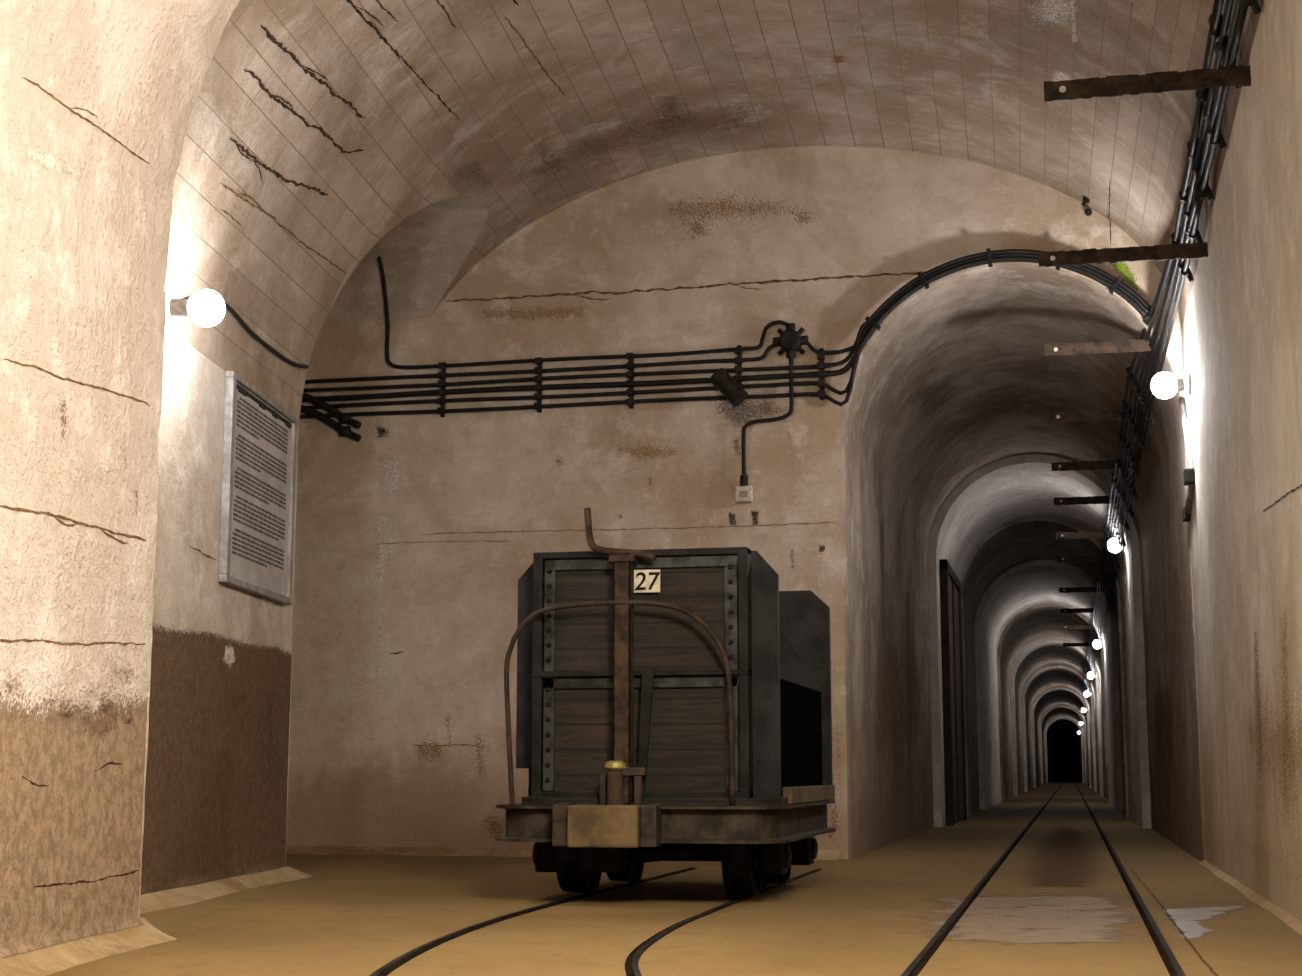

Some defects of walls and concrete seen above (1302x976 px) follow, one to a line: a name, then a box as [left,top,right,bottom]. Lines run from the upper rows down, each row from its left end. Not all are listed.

crack [25,78,150,164]
crack [244,69,364,154]
crack [261,25,364,118]
crack [346,0,459,120]
crack [220,138,345,273]
crack [447,271,926,302]
damp [0,618,292,958]